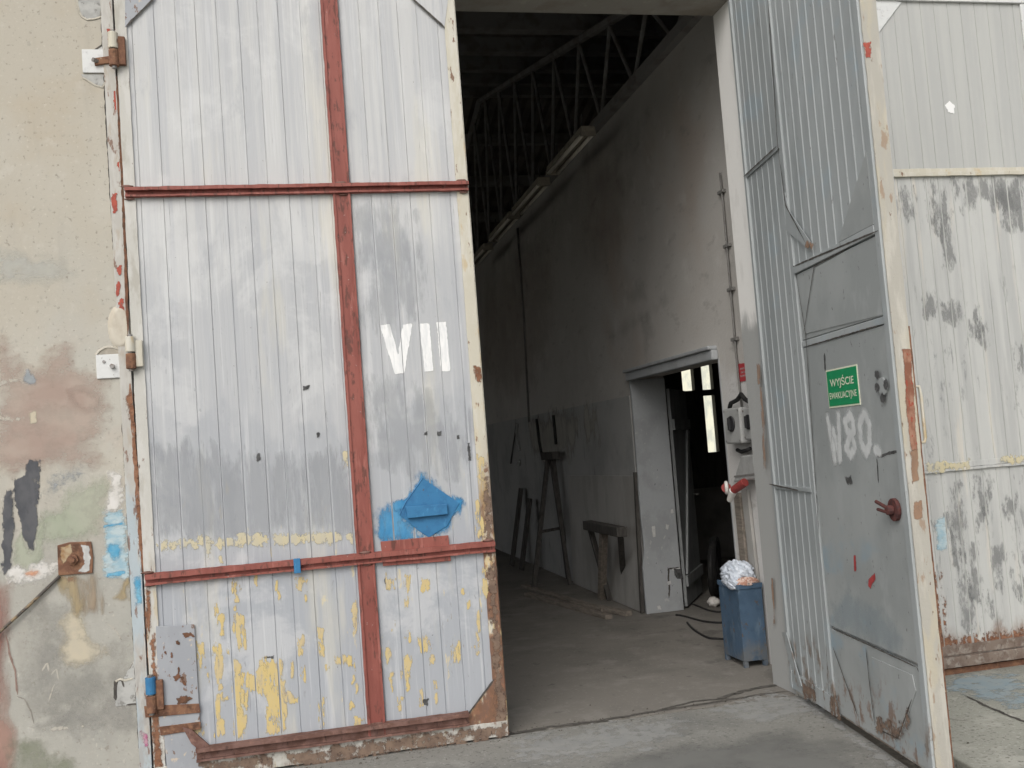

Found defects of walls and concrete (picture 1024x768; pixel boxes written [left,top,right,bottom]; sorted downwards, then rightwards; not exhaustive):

corrosion [116,76,129,334]
peeling [930,178,1023,261]
peeling [923,296,986,349]
corrosion [902,349,970,482]
corrosion [126,384,144,572]
peeling [156,532,356,563]
peeling [193,581,306,738]
peeling [317,627,364,726]
corrosion [286,552,509,766]
peeling [385,630,438,711]
corrosion [935,572,1024,647]
corrosion [198,754,273,768]